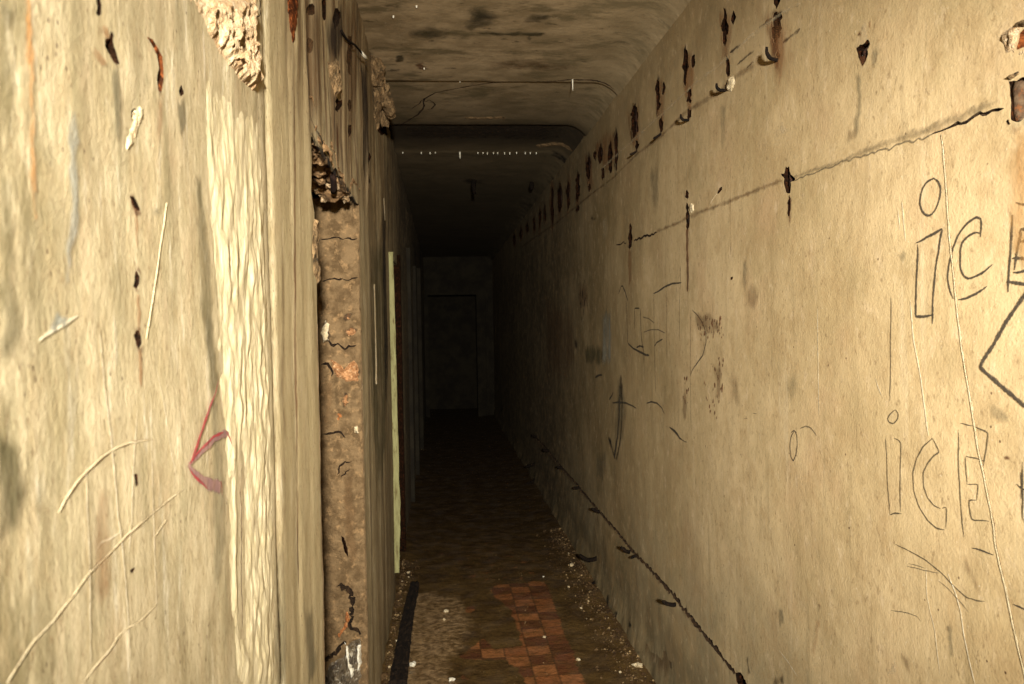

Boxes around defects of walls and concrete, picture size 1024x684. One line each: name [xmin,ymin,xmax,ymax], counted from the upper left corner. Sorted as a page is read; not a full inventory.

spalling [190,0,264,91]
spalling [1001,20,1024,55]
crack [932,108,1004,134]
spalling [1006,71,1024,125]
crack [617,232,657,245]
crack [321,340,356,376]
crack [324,431,350,477]
crack [536,438,735,674]
crack [324,583,361,662]